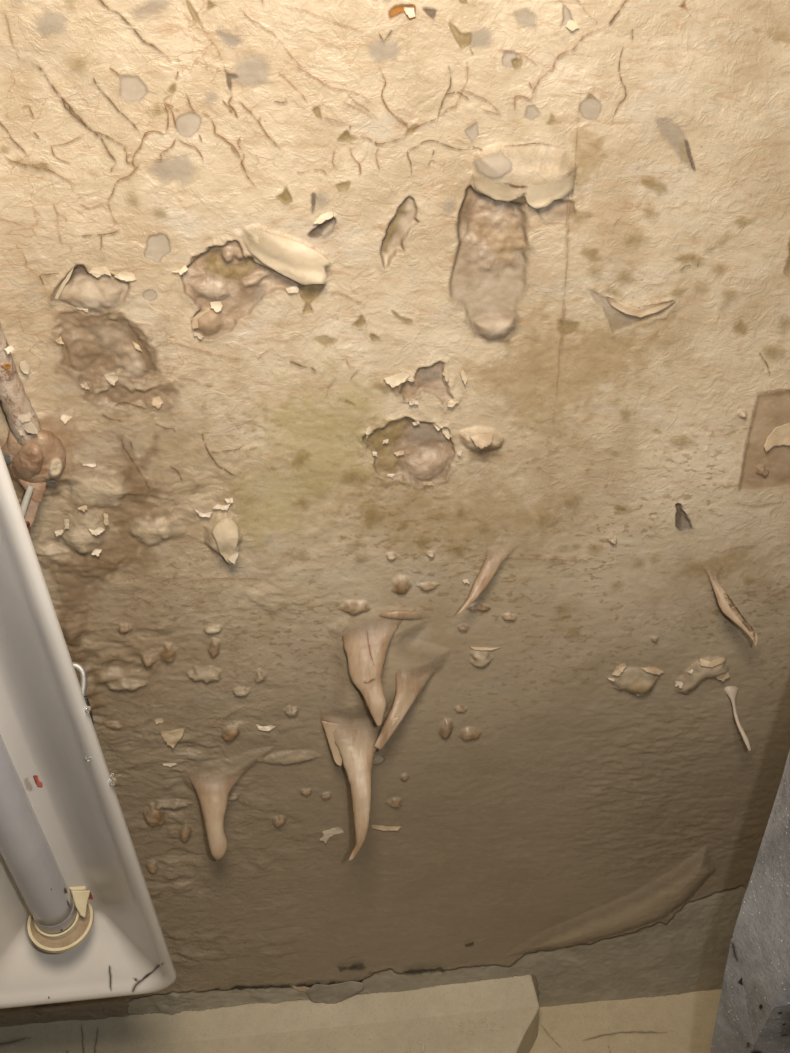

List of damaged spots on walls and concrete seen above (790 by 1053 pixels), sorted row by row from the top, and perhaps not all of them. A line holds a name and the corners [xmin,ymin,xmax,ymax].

crack [100,0,161,52]
crack [244,12,588,173]
crack [610,0,633,112]
peeling [51,265,176,409]
crack [0,67,275,249]
spalling [172,241,300,339]
spalling [381,197,419,268]
spalling [448,186,529,340]
spalling [537,200,575,221]
peeling [607,298,676,318]
spalling [363,362,468,486]
damp [764,423,790,452]